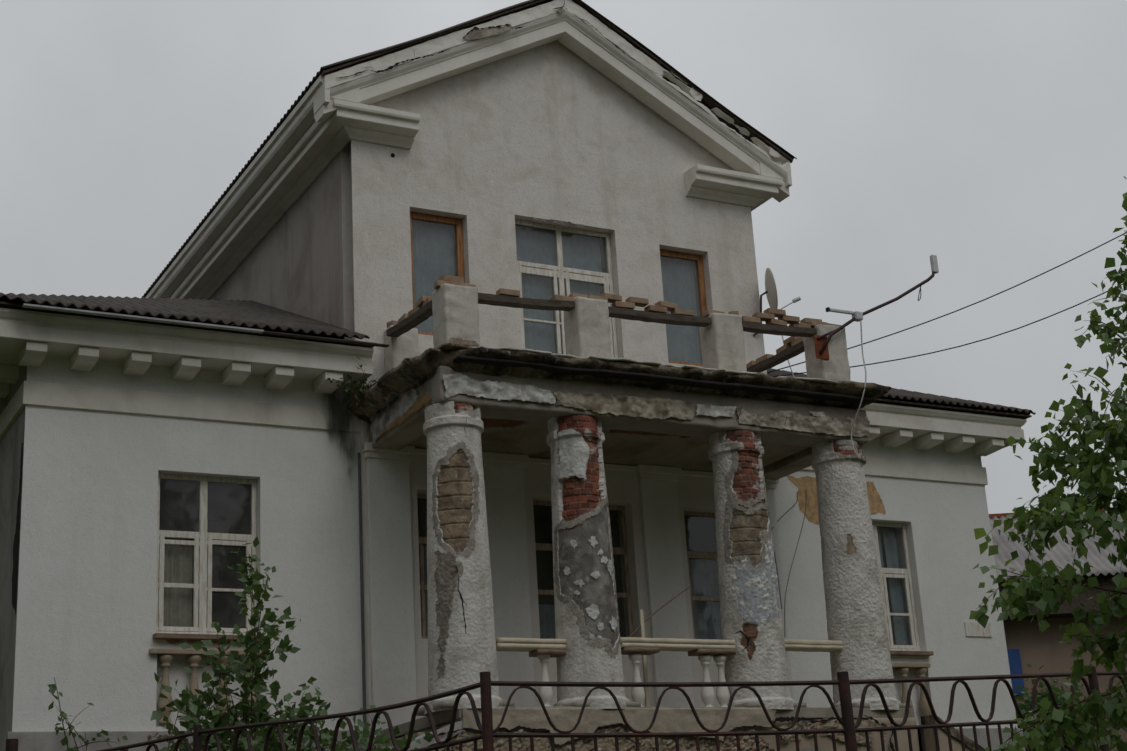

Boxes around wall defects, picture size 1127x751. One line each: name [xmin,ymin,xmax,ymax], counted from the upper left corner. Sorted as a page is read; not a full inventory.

spalling [463,24,524,40]
peeling [670,71,703,101]
peeling [443,372,870,660]
peeling [866,481,885,515]
spalling [432,442,480,680]
crack [452,569,467,632]